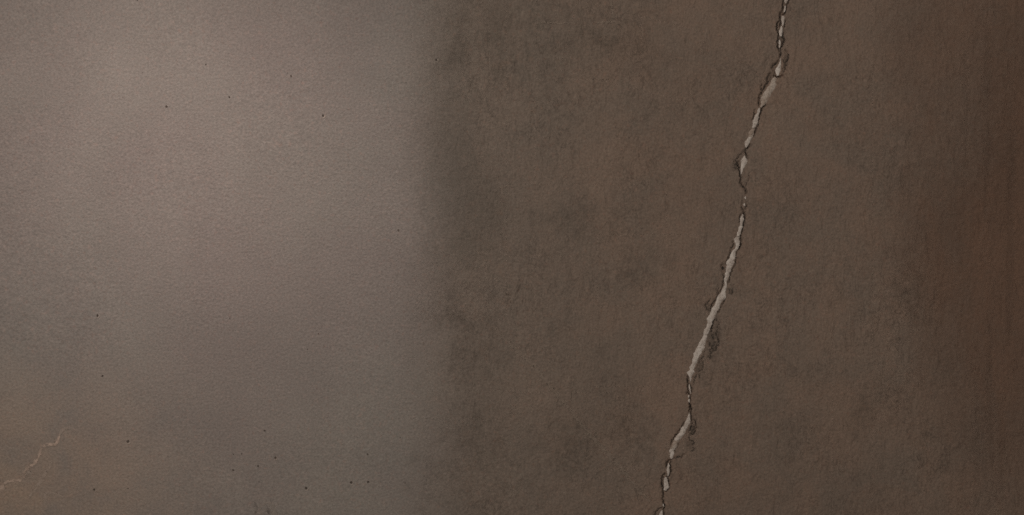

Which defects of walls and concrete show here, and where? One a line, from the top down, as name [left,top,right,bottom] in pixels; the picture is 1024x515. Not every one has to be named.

crack [655,0,789,515]